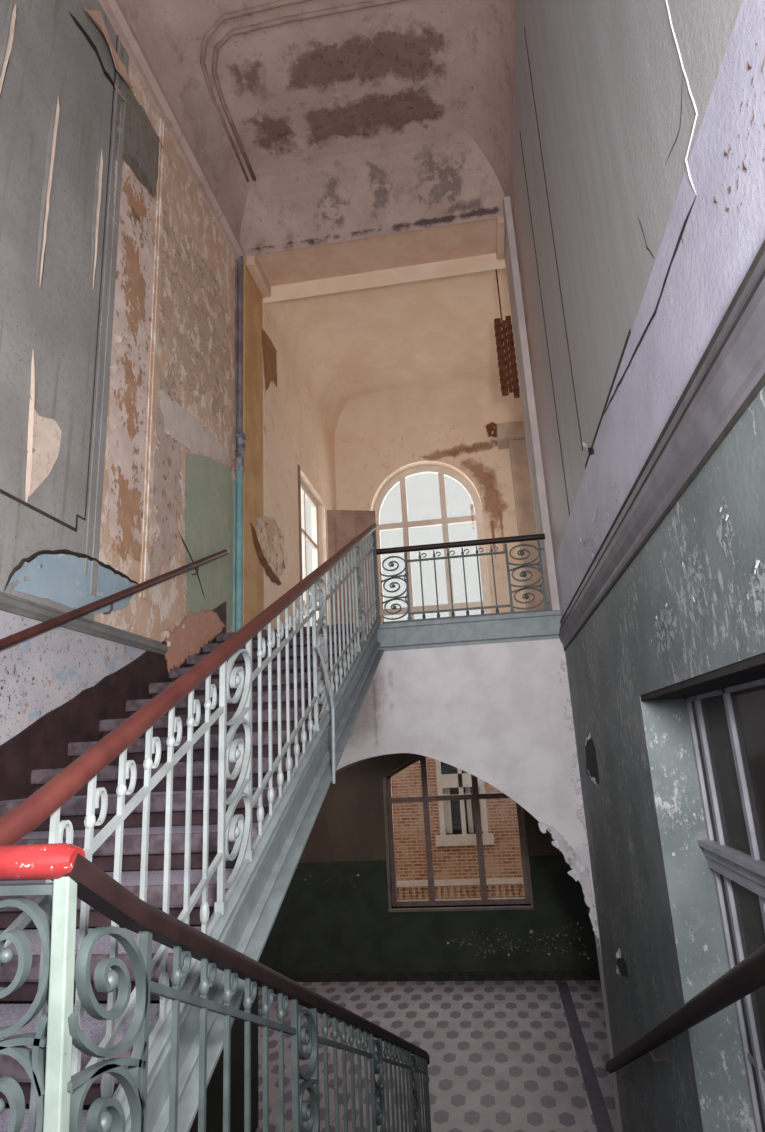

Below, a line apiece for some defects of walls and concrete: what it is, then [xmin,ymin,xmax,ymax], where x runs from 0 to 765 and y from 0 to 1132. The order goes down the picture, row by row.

crack [0,0,18,97]
peeling [252,108,293,156]
peeling [289,28,443,144]
crack [36,92,60,289]
crack [603,0,698,415]
flaking render [4,160,232,615]
peeling [716,496,735,558]
peeling [748,558,765,619]